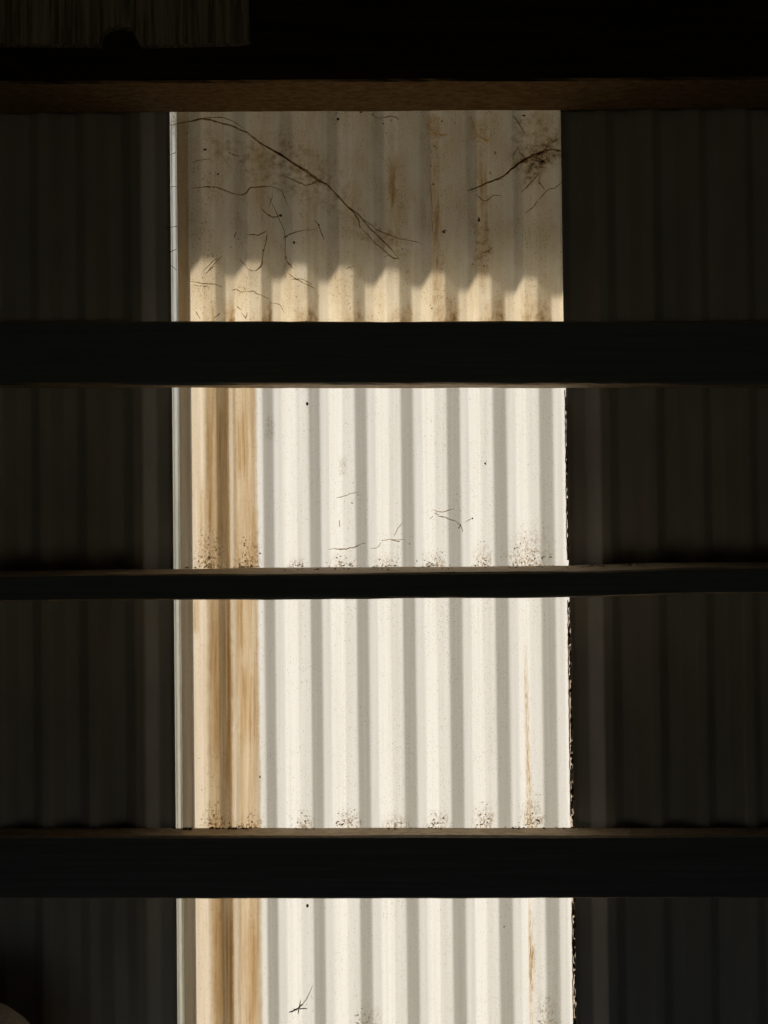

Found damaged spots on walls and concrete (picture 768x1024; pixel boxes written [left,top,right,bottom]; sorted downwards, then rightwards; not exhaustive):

damp [210,600,230,762]